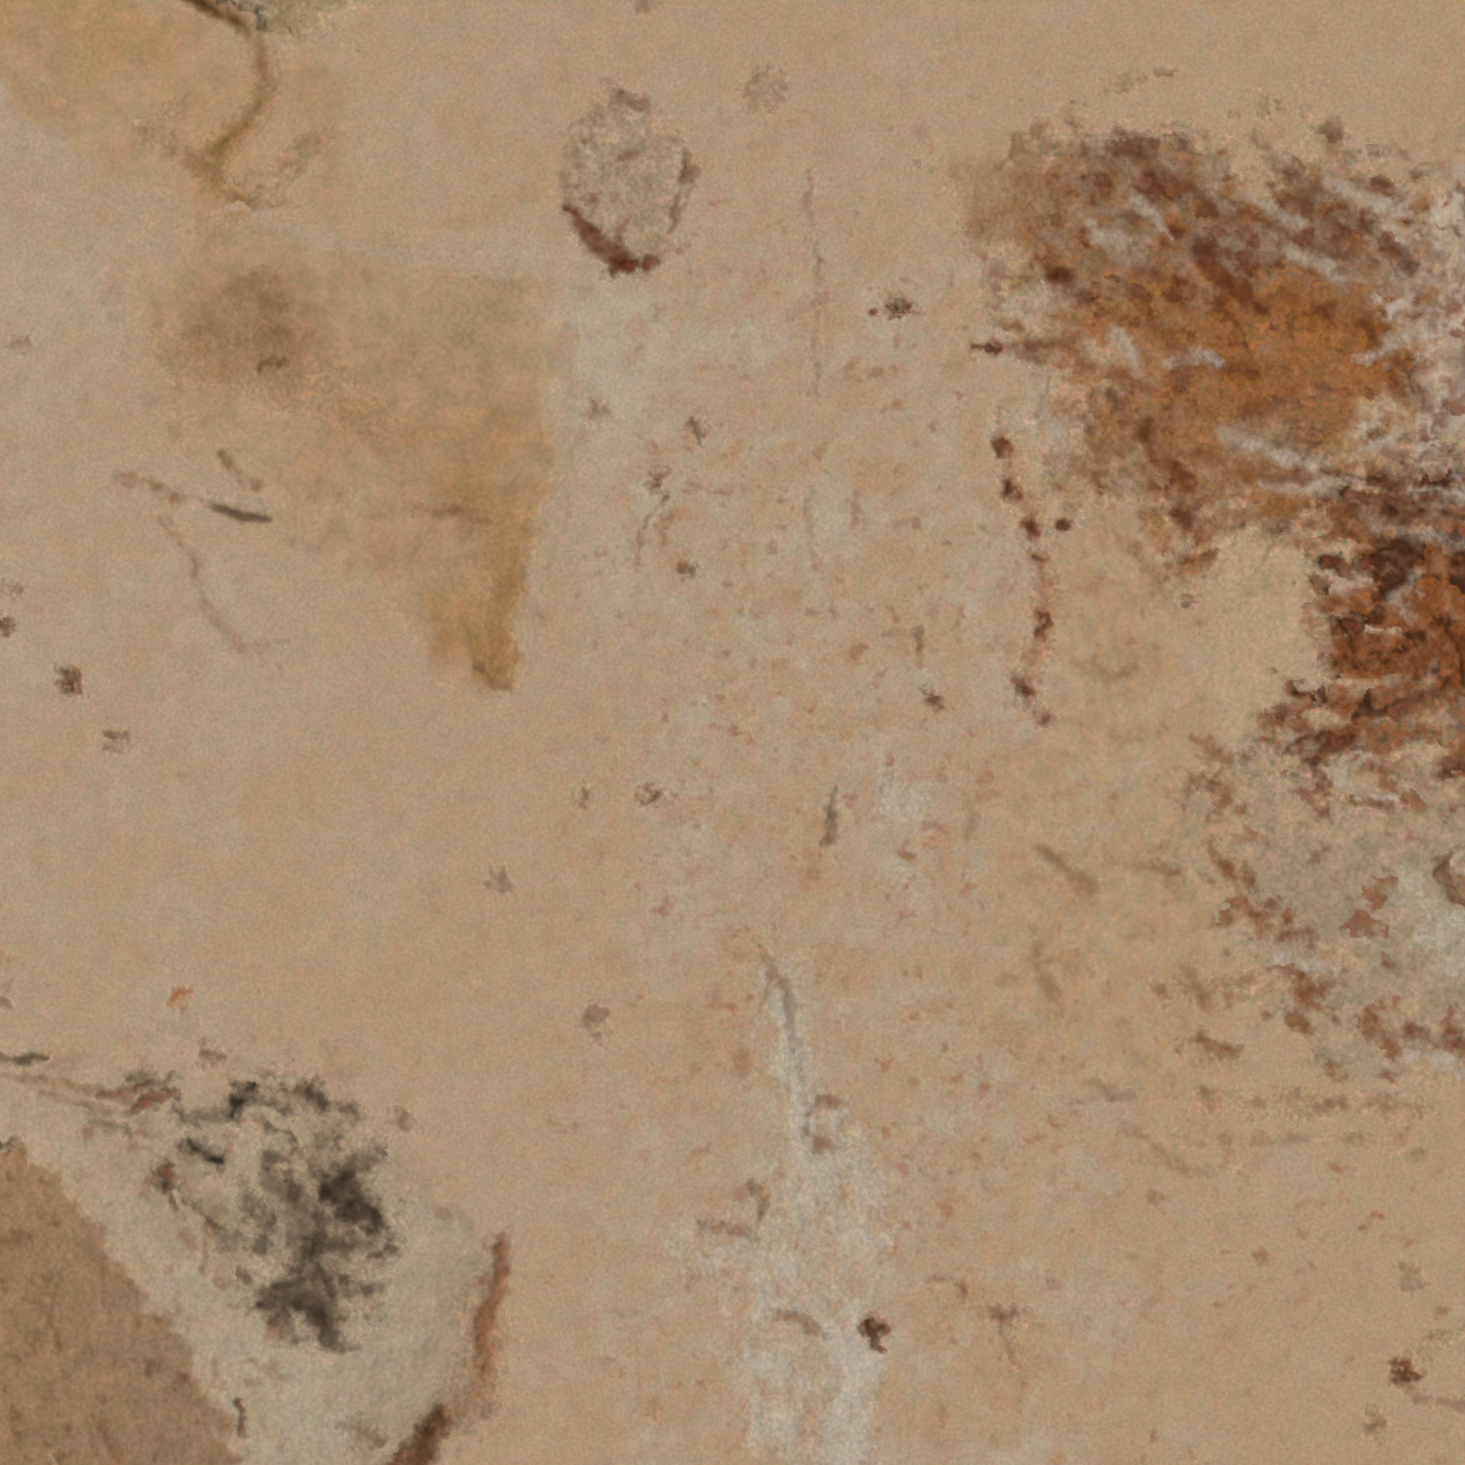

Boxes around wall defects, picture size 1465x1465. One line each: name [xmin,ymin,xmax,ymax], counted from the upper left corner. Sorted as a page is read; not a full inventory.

water stain [0,0,251,228]
water stain [228,17,361,222]
peeling [86,72,705,705]
rust [913,65,1465,813]
water stain [1341,122,1465,476]
spalling [96,725,140,758]
water stain [80,1114,133,1139]
spalling [0,1130,255,1465]
spalling [164,984,196,1017]
spalling [193,1033,233,1072]
water stain [117,1049,413,1358]
spalling [573,997,614,1051]